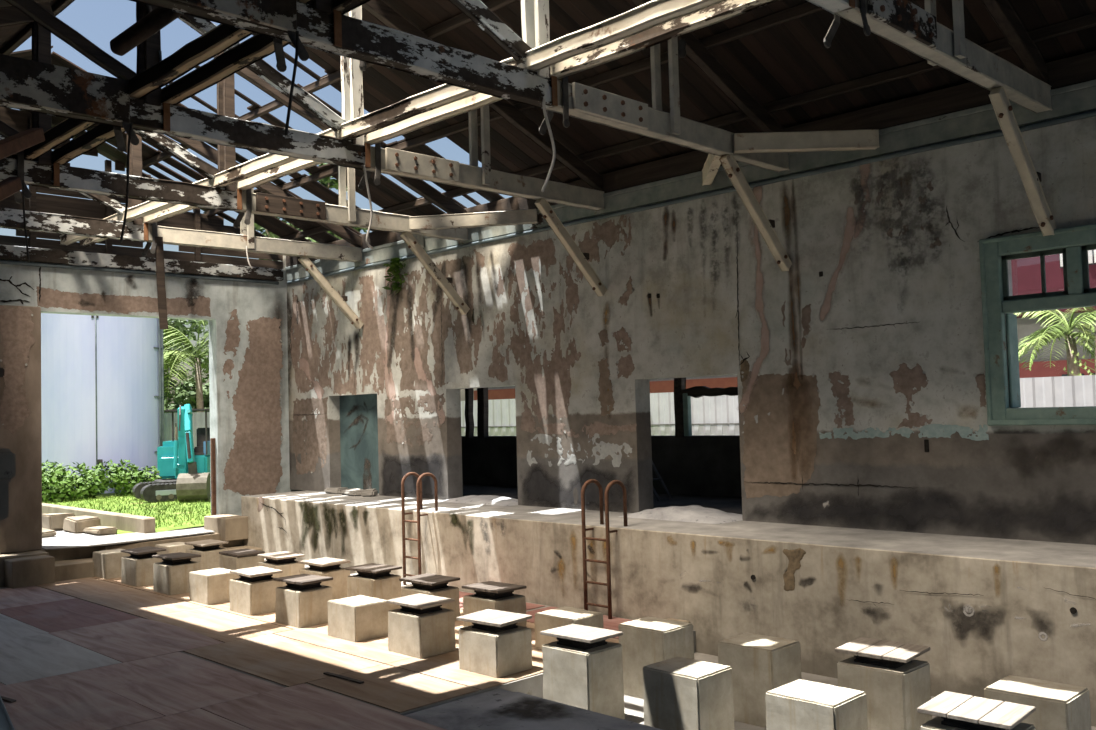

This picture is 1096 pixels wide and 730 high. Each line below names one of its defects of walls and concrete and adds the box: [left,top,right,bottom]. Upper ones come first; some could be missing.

corrosion [783,188,796,239]
water stain [852,166,944,268]
crack [0,267,41,304]
peeling [223,215,637,496]
peeling [740,304,855,499]
corrosion [788,256,809,479]
peeling [889,363,932,429]
water stain [754,490,1096,537]
water stain [948,604,1002,637]